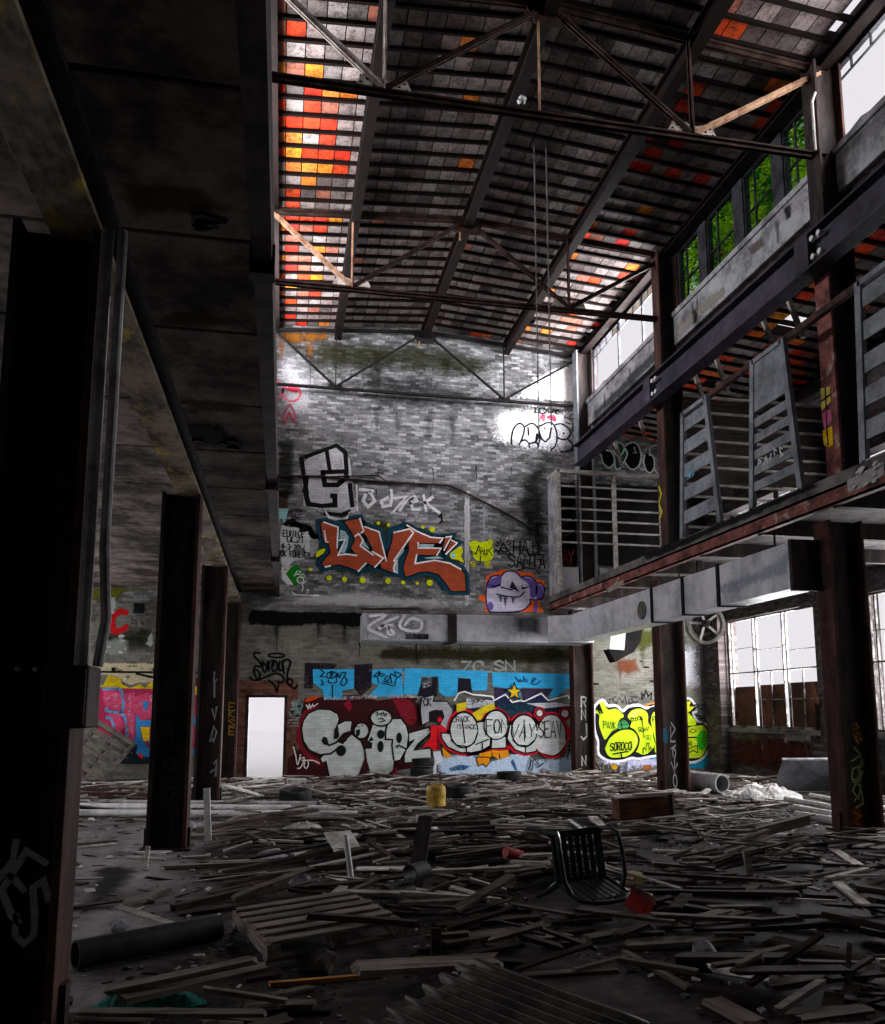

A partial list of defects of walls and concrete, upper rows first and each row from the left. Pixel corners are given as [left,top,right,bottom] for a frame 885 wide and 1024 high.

water stain [285,365,308,414]
water stain [294,341,487,405]
water stain [520,469,543,544]
water stain [248,594,469,636]